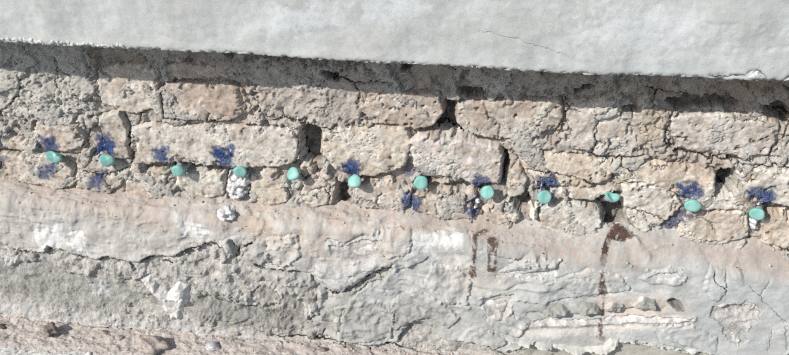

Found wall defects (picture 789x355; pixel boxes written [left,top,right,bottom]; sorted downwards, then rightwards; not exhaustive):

crack [0,77,29,115]
crack [79,56,142,188]
crack [158,67,337,159]
crack [526,120,638,185]
crack [664,105,789,167]
spalling [244,285,315,324]
rust [468,229,498,278]
spalling [500,257,562,281]
spalling [520,296,694,329]
rust [598,222,634,340]
spalling [644,264,688,284]
spalling [710,300,760,347]